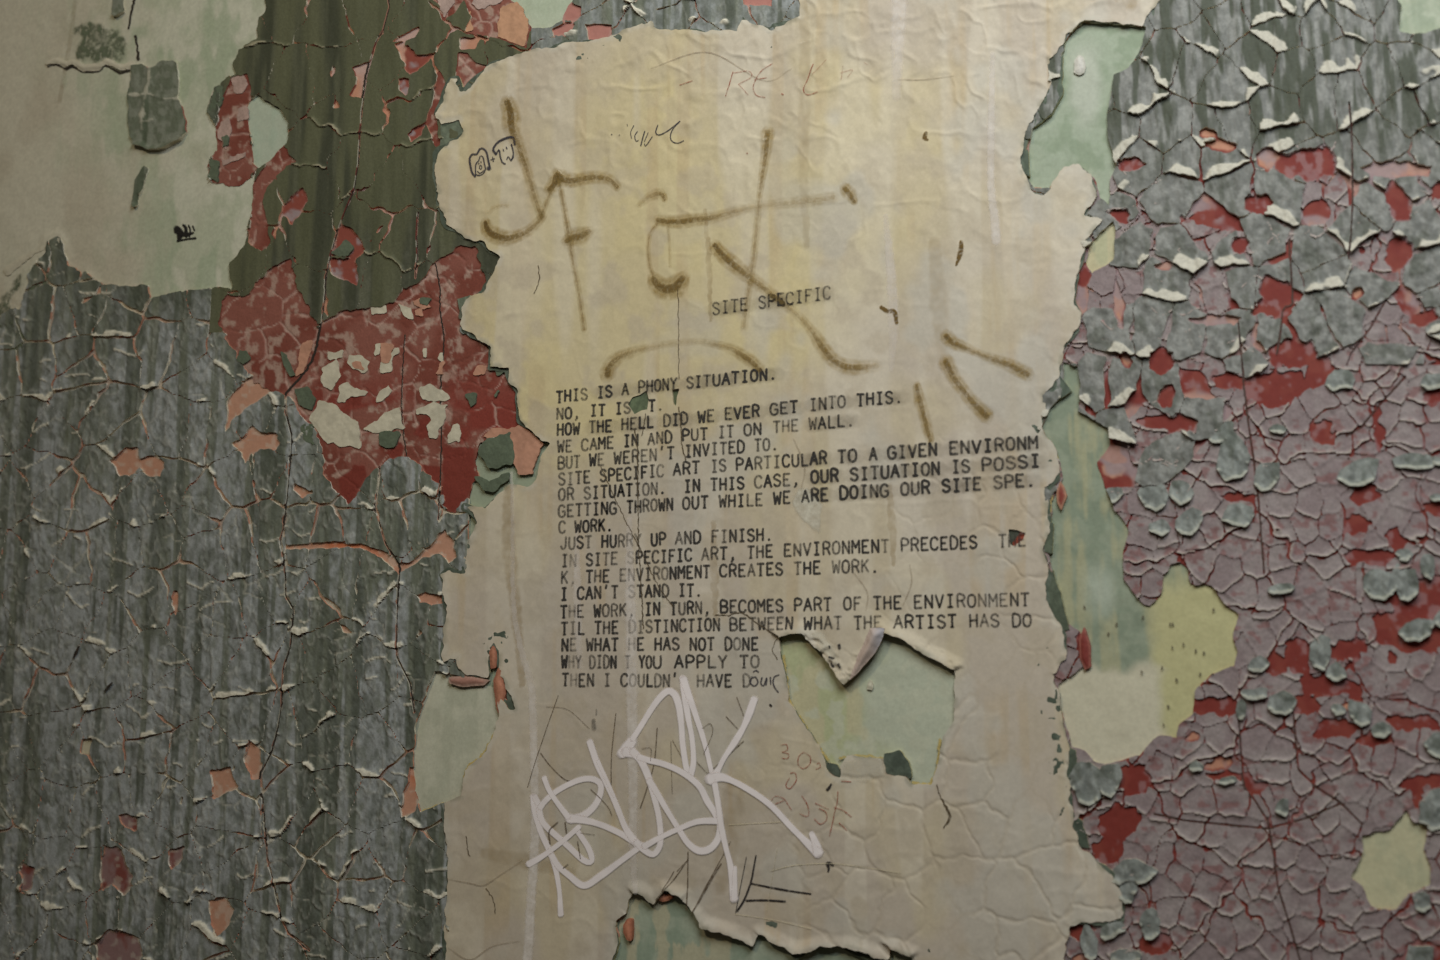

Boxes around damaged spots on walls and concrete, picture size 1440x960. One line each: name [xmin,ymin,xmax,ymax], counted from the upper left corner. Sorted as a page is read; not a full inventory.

crack [1347,102,1355,259]
crack [259,0,390,950]
peeling [0,0,800,960]
crack [374,212,445,711]
peeling [1024,0,1440,960]
crack [1237,322,1265,574]
crack [1346,301,1386,365]
crack [1346,376,1406,436]
peeling [617,891,864,960]
peeling [780,633,955,785]
peeling [890,950,912,960]
crack [1153,704,1363,960]